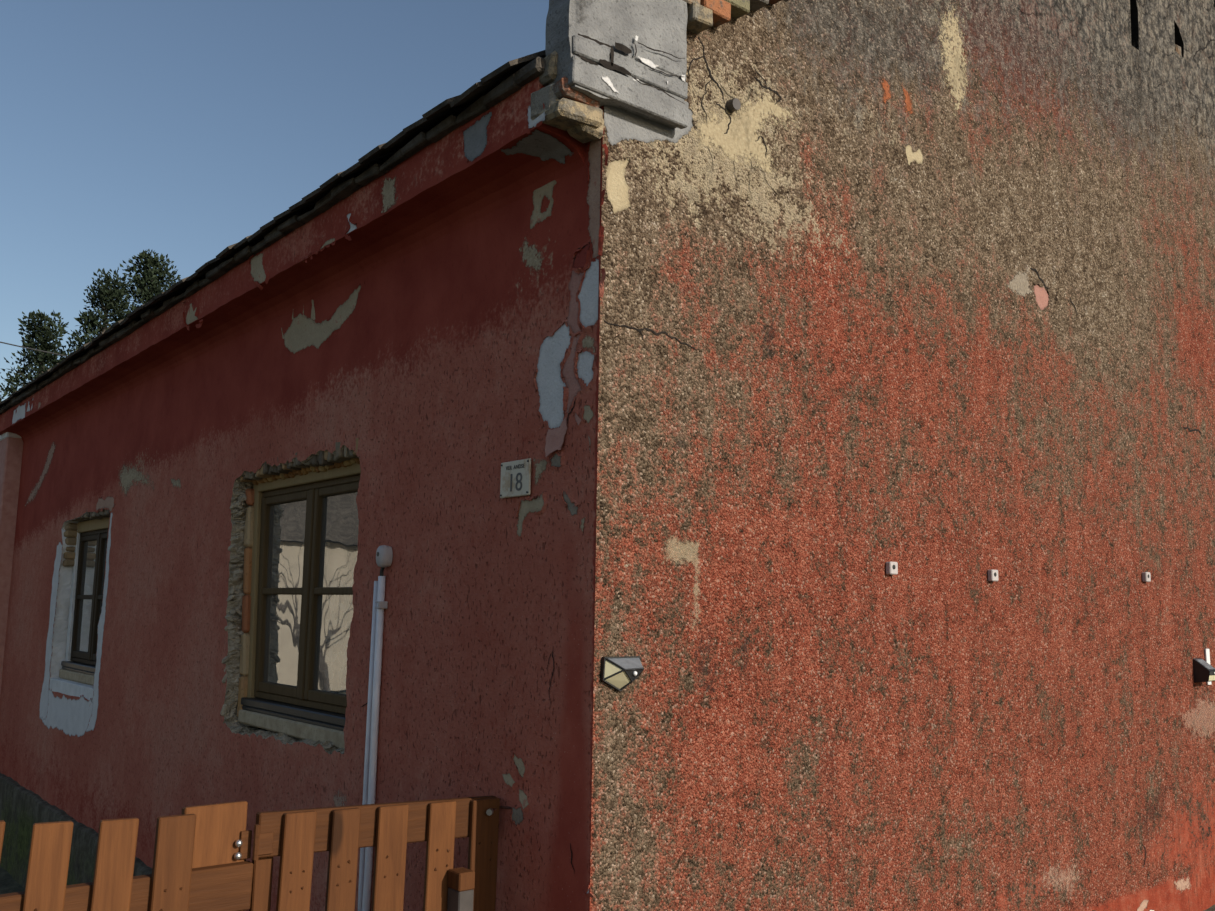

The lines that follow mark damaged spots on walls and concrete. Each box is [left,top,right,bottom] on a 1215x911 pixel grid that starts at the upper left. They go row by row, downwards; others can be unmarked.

crack [578,33,731,134]
crack [755,69,782,104]
flaking render [938,0,971,116]
flaking render [462,110,494,164]
peeling [501,103,572,164]
flaking render [248,254,270,290]
peeling [281,282,365,355]
flaking render [515,91,798,541]
peeling [25,442,56,506]
peeling [40,463,154,738]